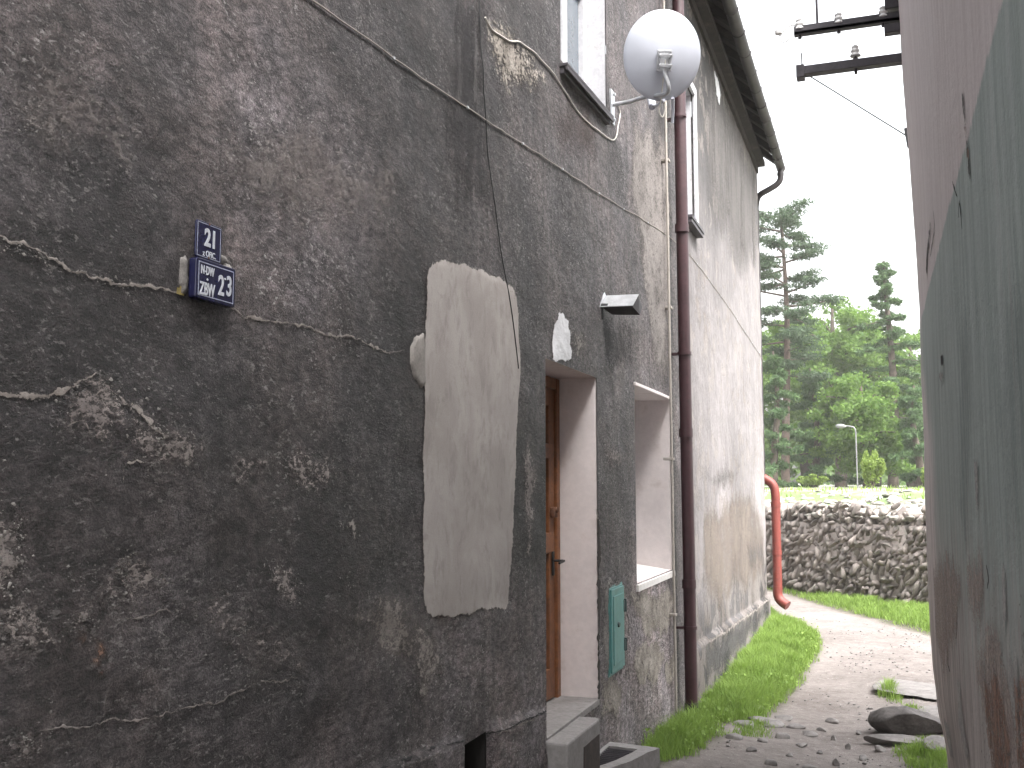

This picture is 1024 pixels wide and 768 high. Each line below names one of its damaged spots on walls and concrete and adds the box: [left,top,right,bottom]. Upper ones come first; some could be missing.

crack [0,235,177,302]
crack [232,307,404,354]
crack [0,370,204,486]